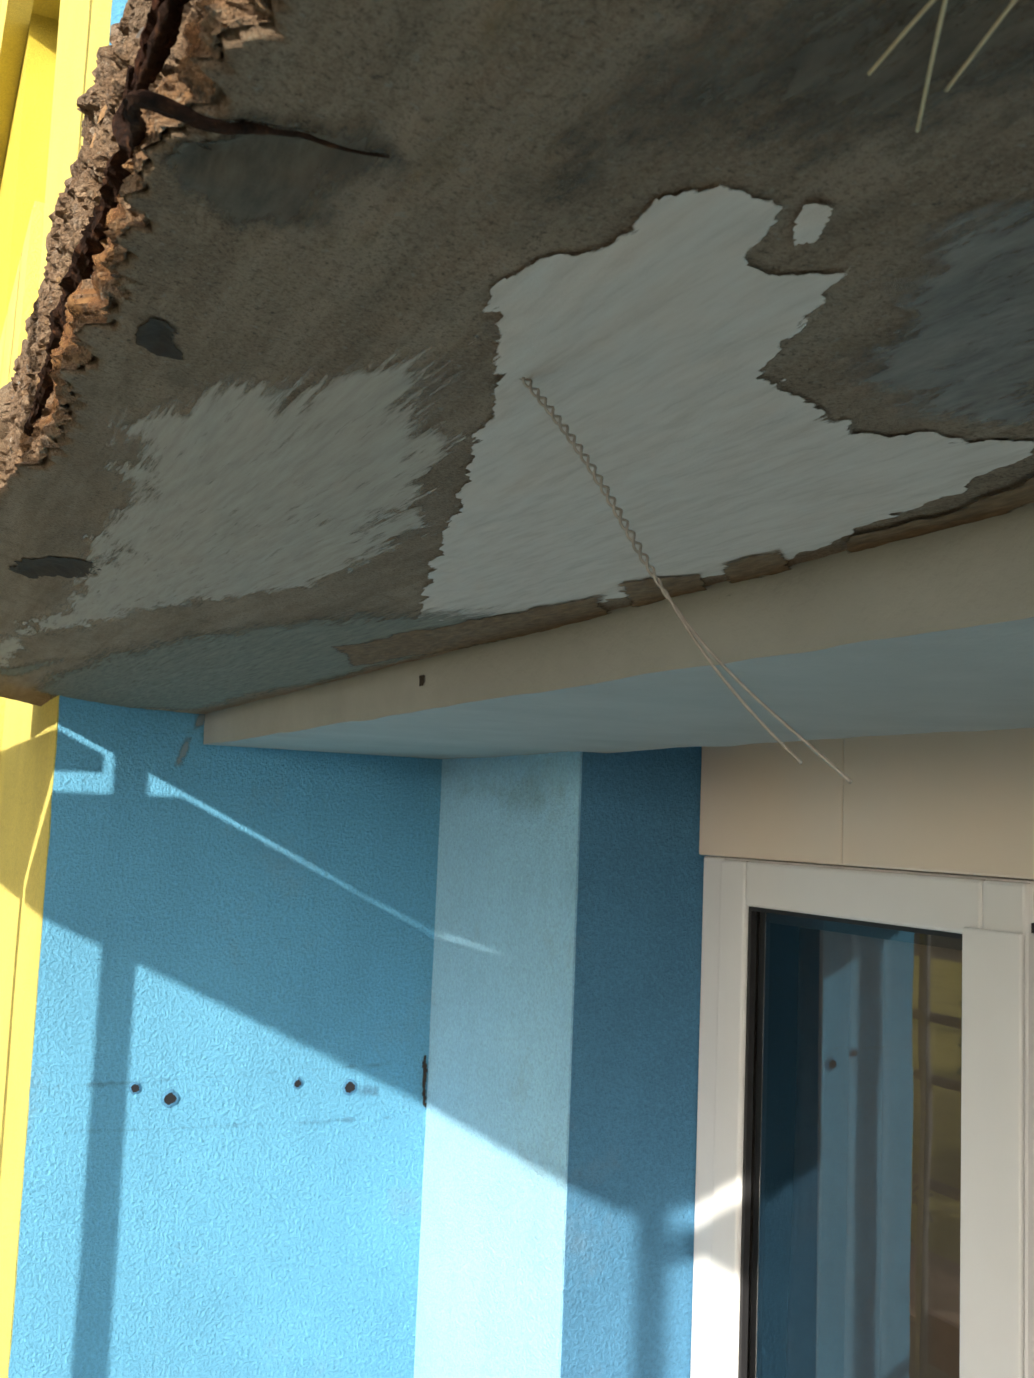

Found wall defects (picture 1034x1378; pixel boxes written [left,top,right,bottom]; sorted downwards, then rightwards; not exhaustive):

corrosion [32,202,126,426]
corrosion [184,20,201,53]
spalling [0,0,390,489]
peeling [0,185,1034,667]